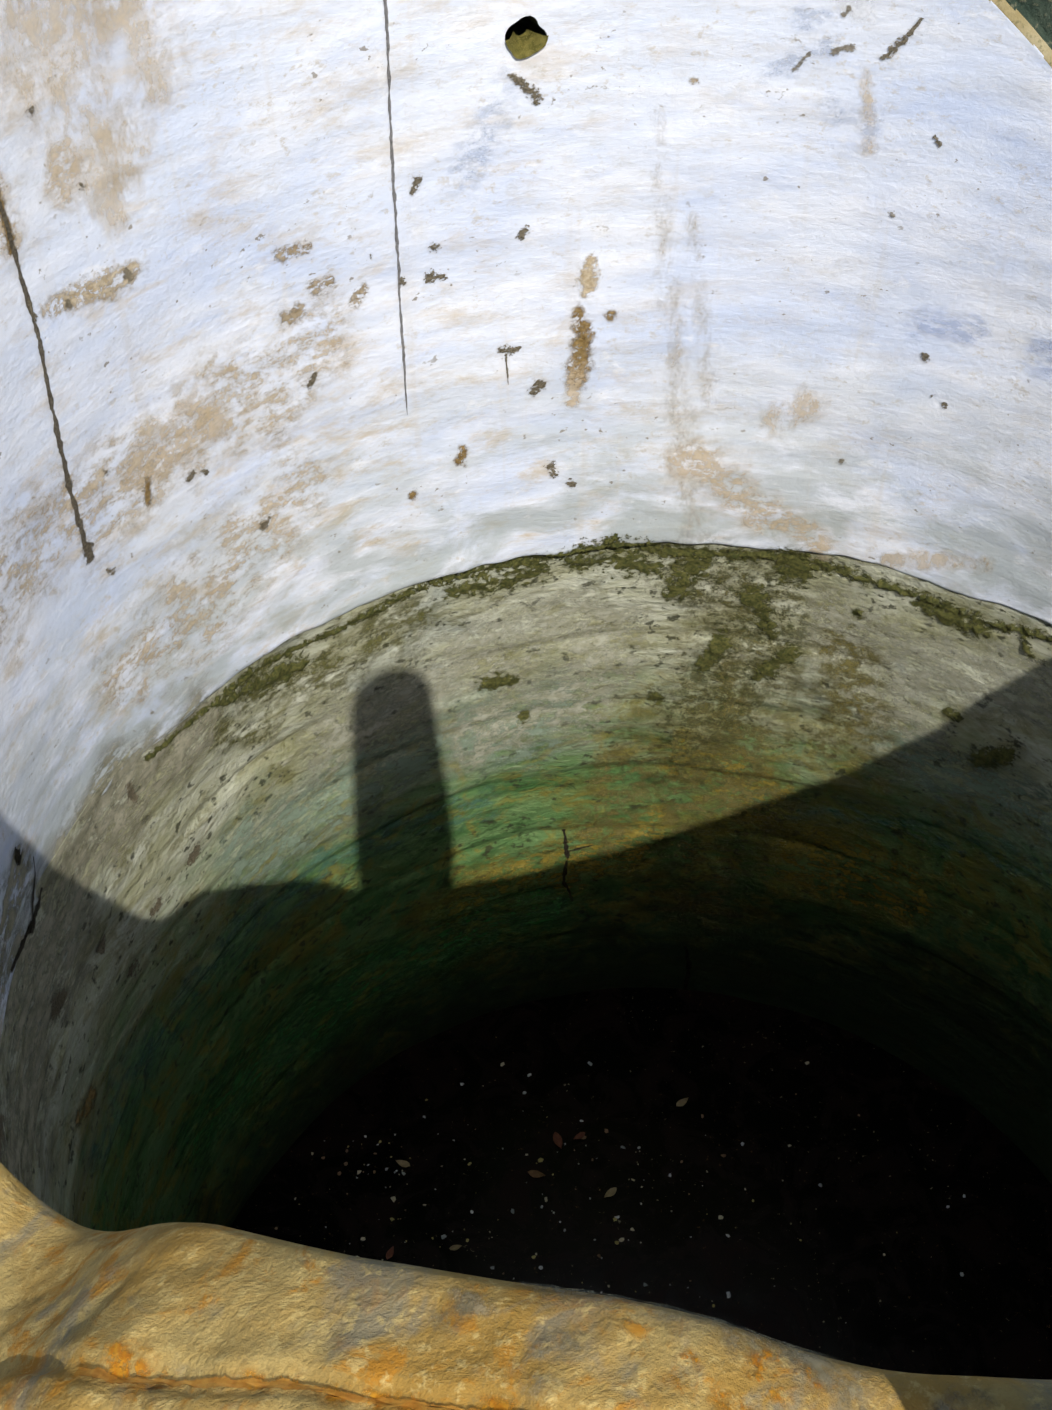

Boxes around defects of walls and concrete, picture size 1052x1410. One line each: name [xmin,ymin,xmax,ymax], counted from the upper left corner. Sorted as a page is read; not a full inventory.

crack [383,0,408,415]
crack [0,177,95,564]
water stain [308,590,640,772]
water stain [581,656,946,929]
water stain [808,597,1052,763]